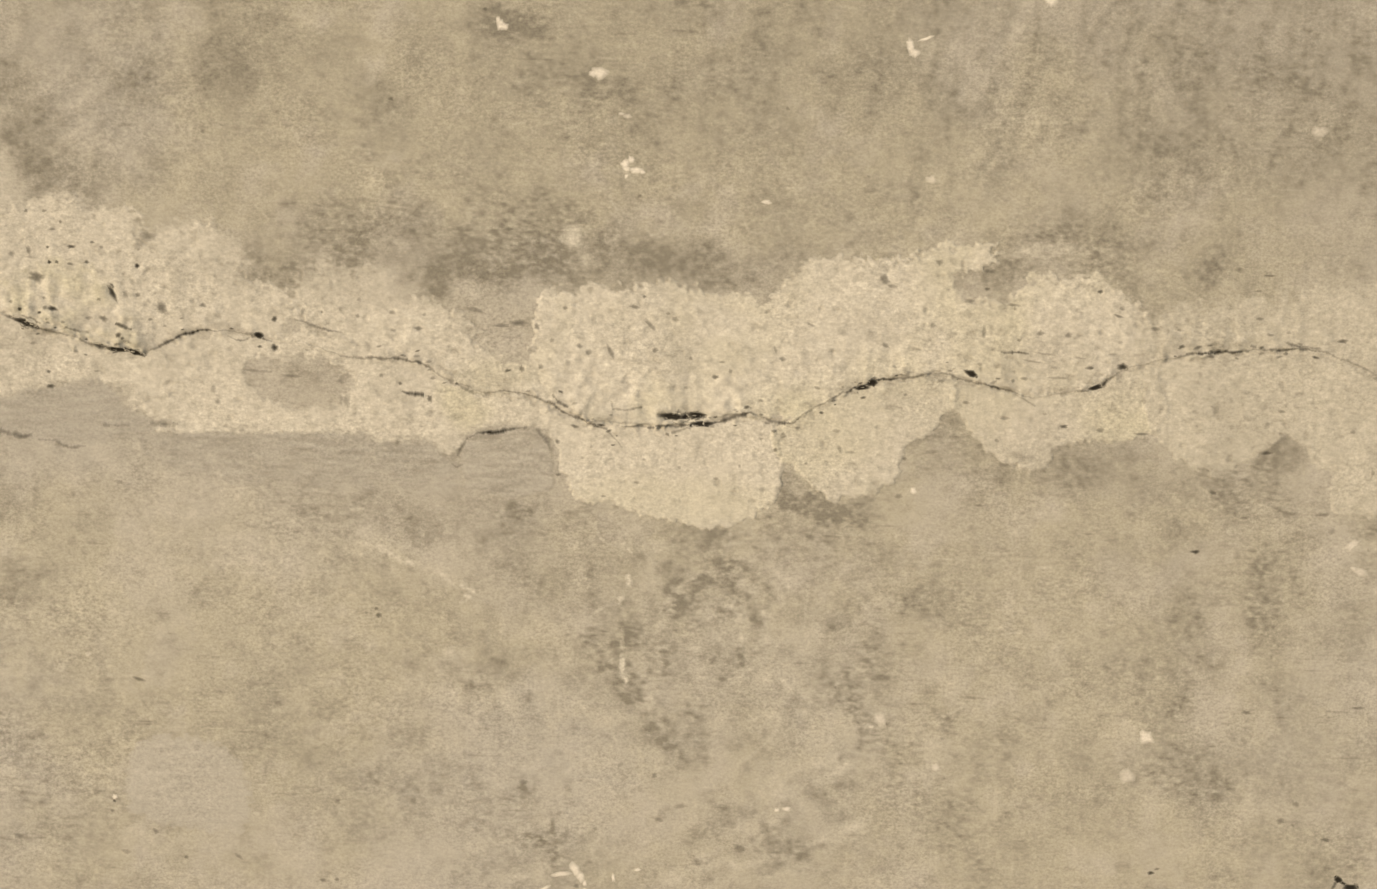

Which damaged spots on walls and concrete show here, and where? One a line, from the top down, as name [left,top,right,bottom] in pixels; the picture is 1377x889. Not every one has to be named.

spalling [0,200,1377,535]
crack [0,313,1377,469]